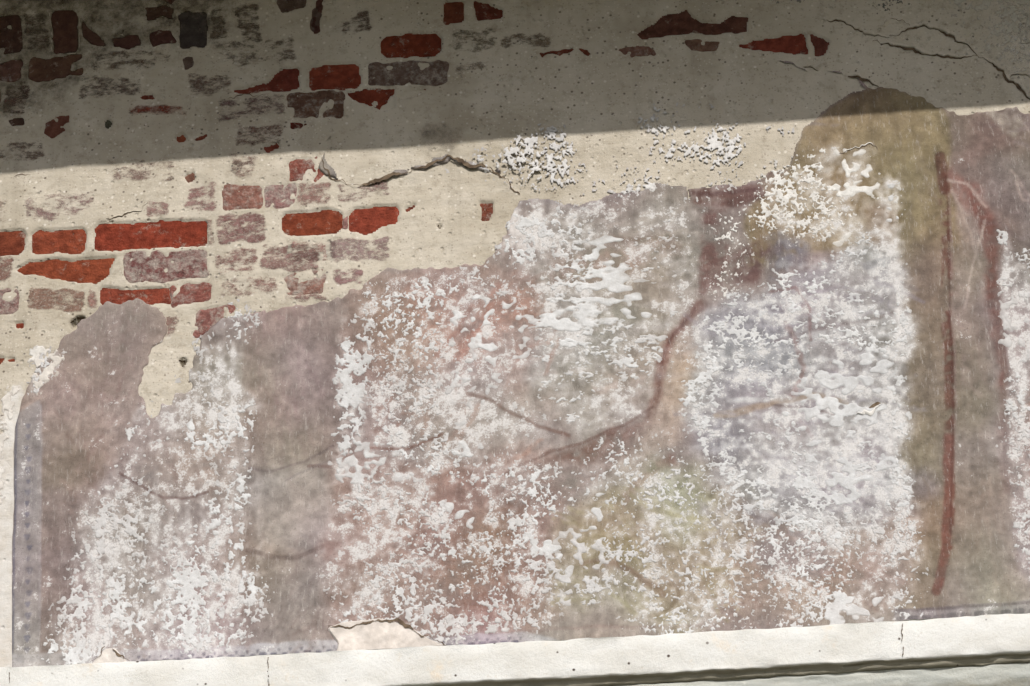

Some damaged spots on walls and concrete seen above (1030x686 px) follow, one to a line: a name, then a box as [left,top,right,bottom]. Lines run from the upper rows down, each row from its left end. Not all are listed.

flaking render [0,0,483,153]
flaking render [443,1,590,57]
flaking render [619,10,829,58]
crack [826,17,1030,100]
peeling [0,102,929,665]